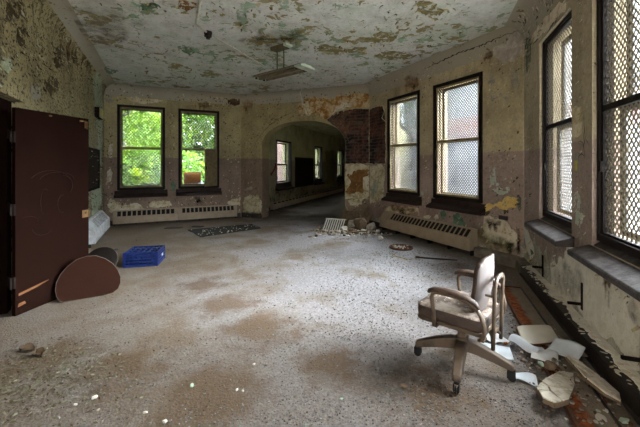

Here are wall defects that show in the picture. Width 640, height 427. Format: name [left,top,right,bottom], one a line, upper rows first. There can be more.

peeling [0,0,460,223]
crack [428,31,515,68]
flaking render [479,135,640,391]